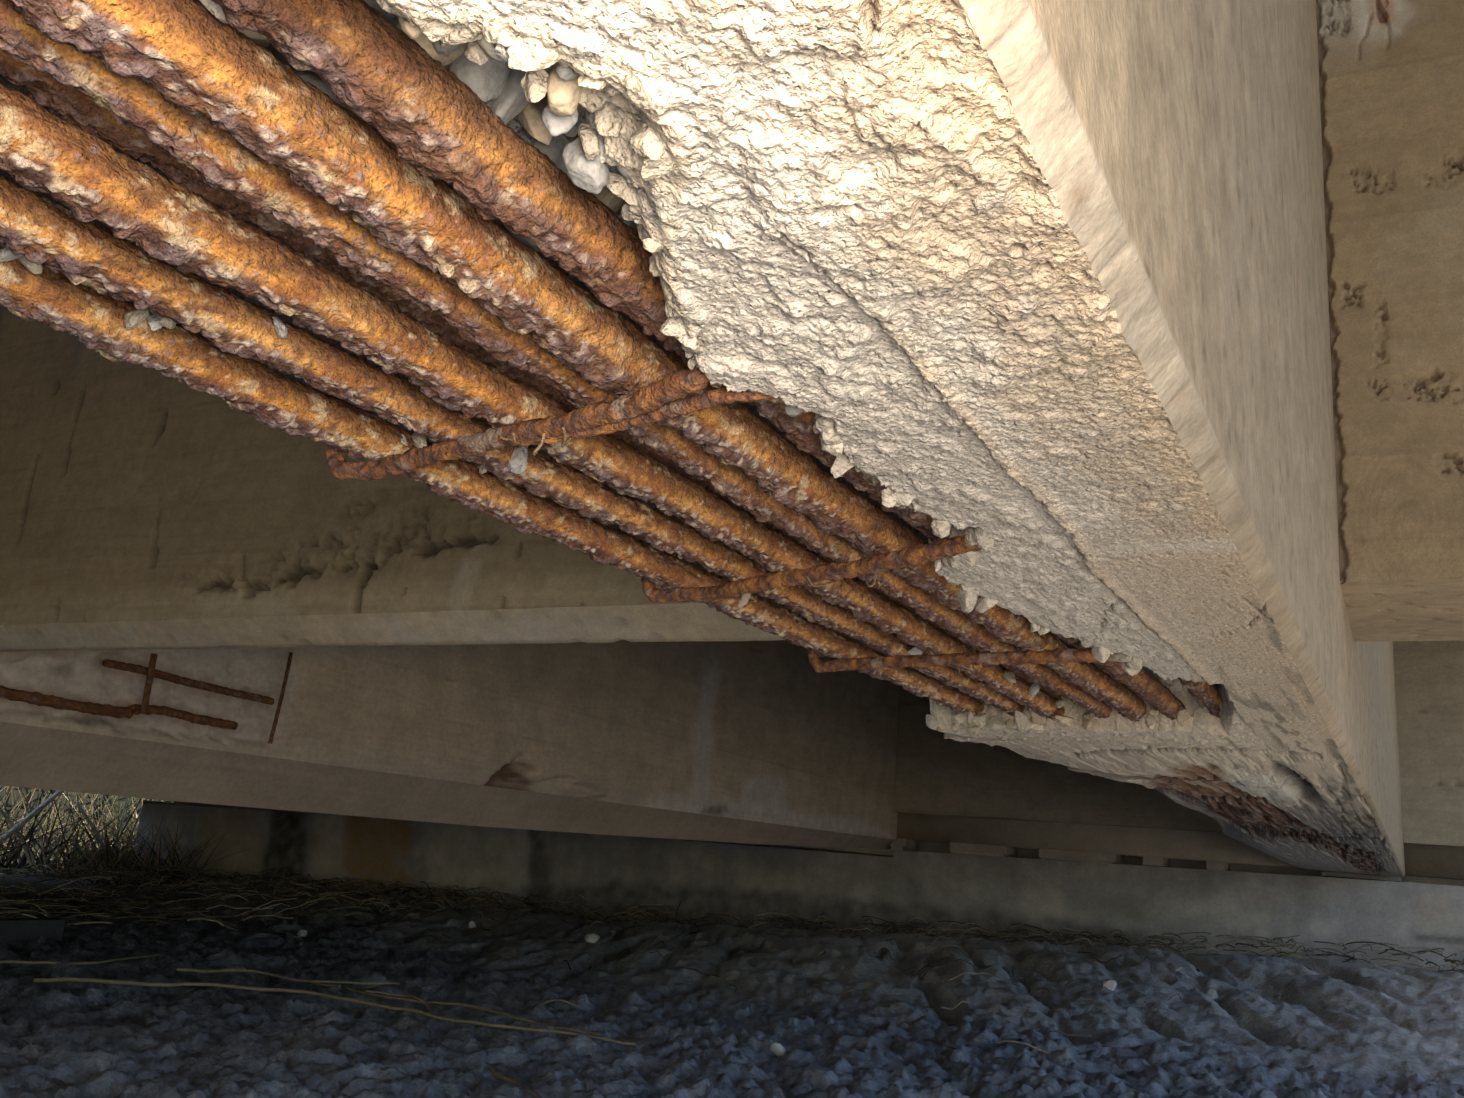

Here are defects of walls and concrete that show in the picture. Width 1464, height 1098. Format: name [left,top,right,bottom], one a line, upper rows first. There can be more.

corrosion [1347,0,1424,52]
spalling [0,0,1236,752]
spalling [1095,758,1391,874]